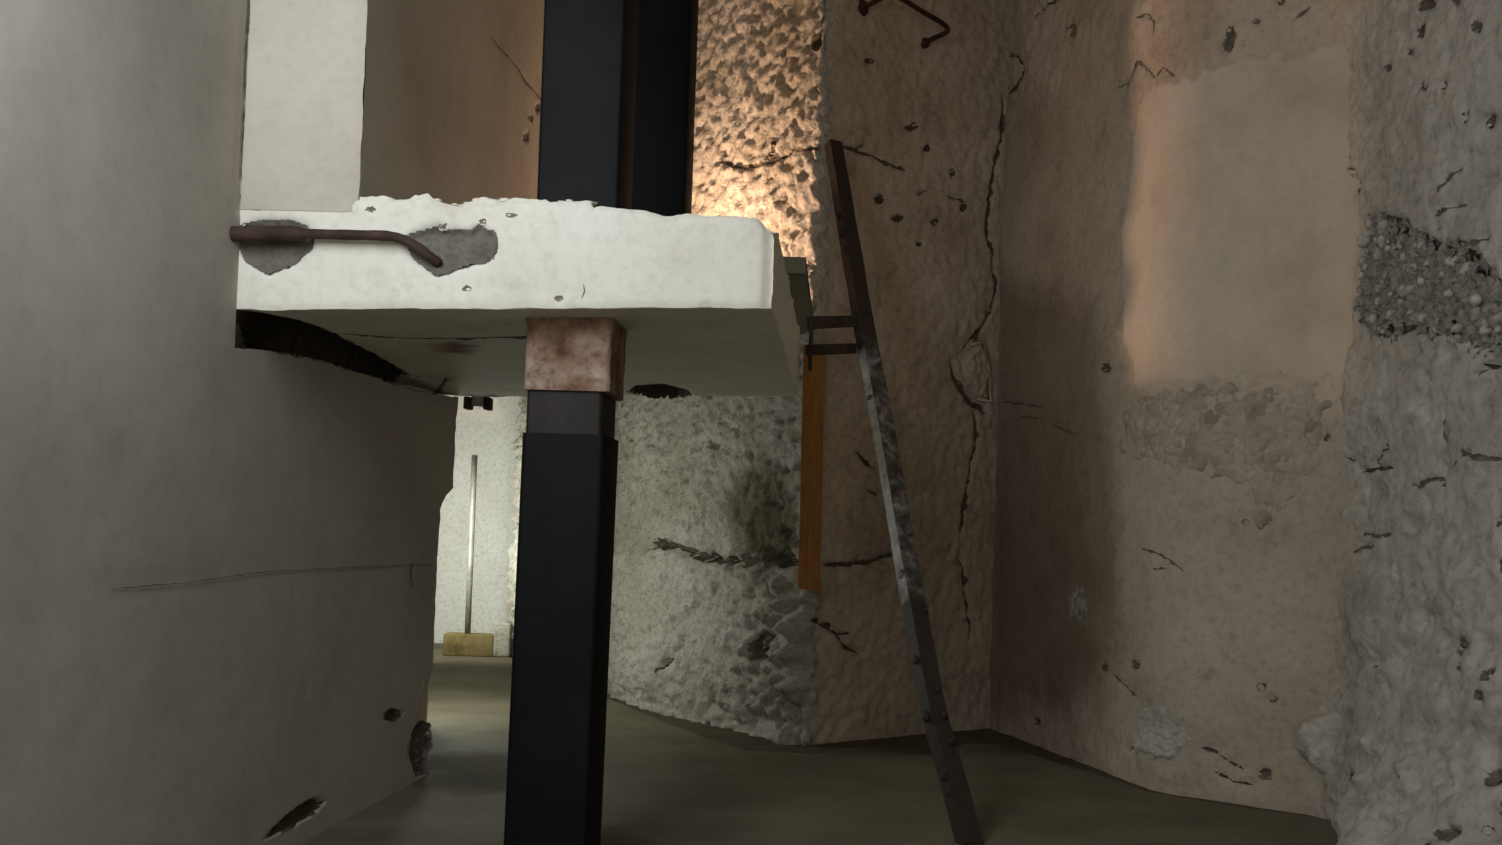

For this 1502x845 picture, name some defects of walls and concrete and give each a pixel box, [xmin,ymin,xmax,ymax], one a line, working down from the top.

crack [491,37,541,100]
crack [1118,14,1175,89]
crack [720,52,1025,354]
spalling [239,219,313,276]
spalling [406,213,519,292]
spalling [1354,168,1502,361]
crack [653,537,893,569]
crack [856,452,886,513]
crack [958,401,1077,631]
spalling [267,798,324,837]